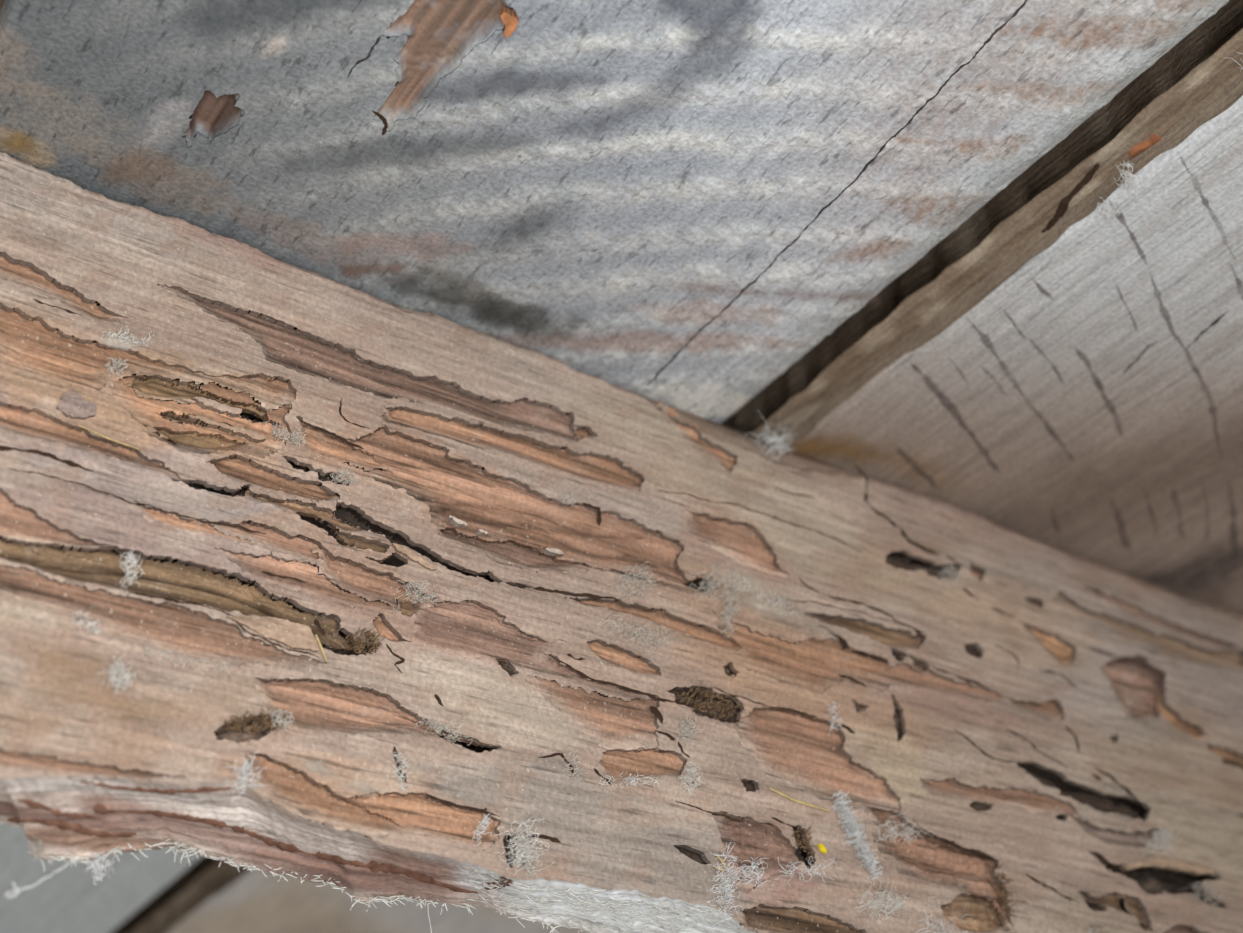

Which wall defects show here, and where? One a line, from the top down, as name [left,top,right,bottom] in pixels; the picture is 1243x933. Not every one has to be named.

peeling [373,0,518,131]
peeling [182,90,245,147]
crack [647,0,1027,386]
crack [1040,163,1100,233]
crack [1187,312,1227,348]
crack [1123,341,1158,374]
peeling [185,397,267,443]
peeling [391,543,438,571]
peeling [538,547,564,557]
peeling [226,615,319,652]
peeling [1119,856,1221,876]